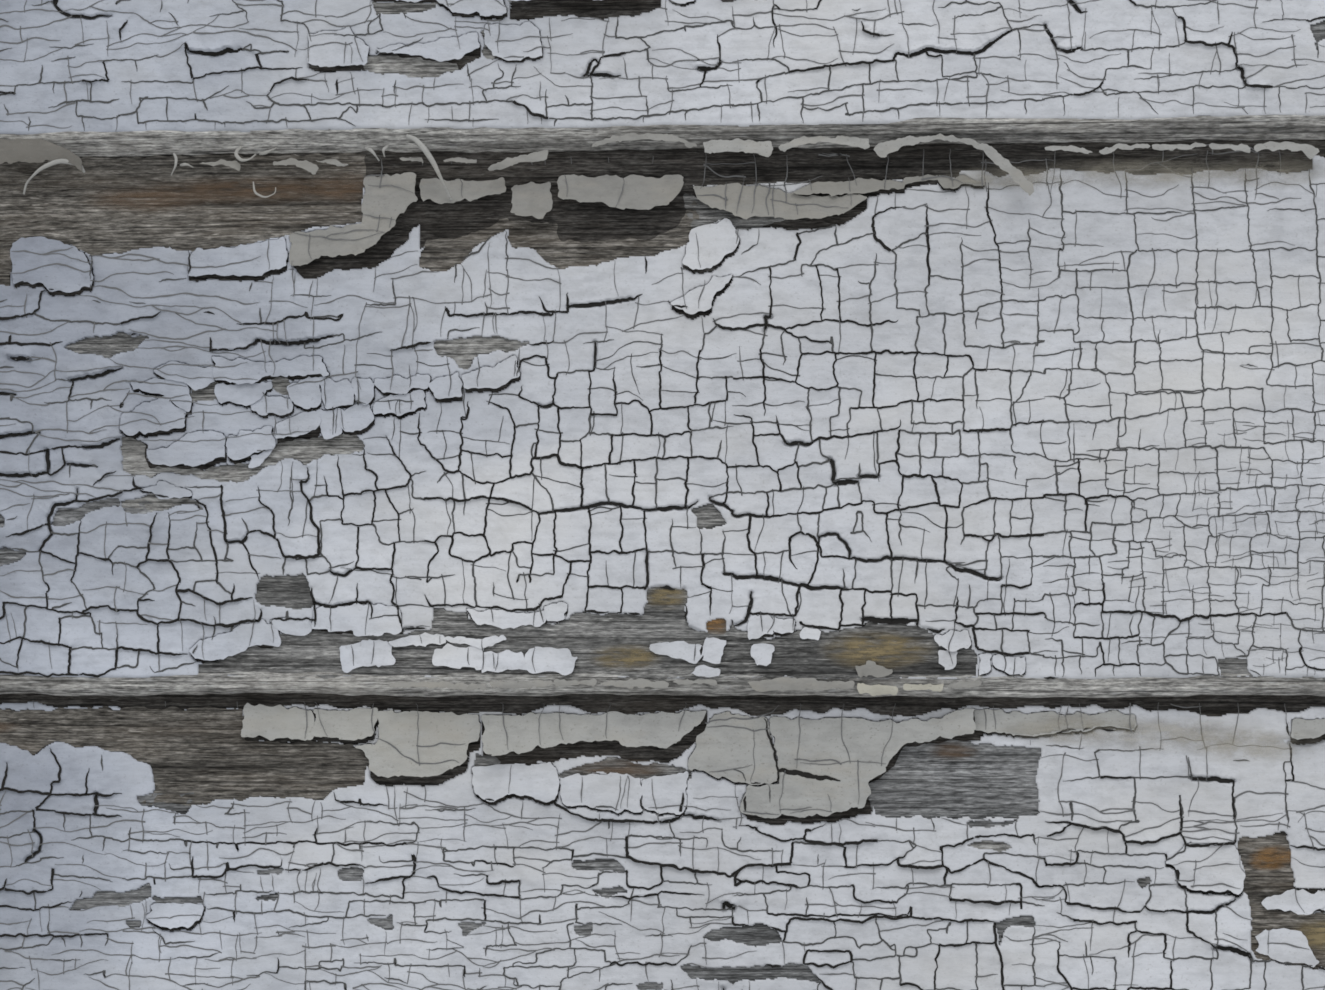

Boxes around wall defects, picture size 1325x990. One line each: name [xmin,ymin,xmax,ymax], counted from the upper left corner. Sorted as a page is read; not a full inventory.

peeling [307,0,542,78]
crack [0,0,1325,132]
peeling [0,153,985,314]
crack [0,144,1325,679]
peeling [189,588,1026,680]
peeling [0,703,1137,820]
peeling [1291,718,1325,740]
crack [0,701,1325,990]
peeling [1166,831,1325,969]